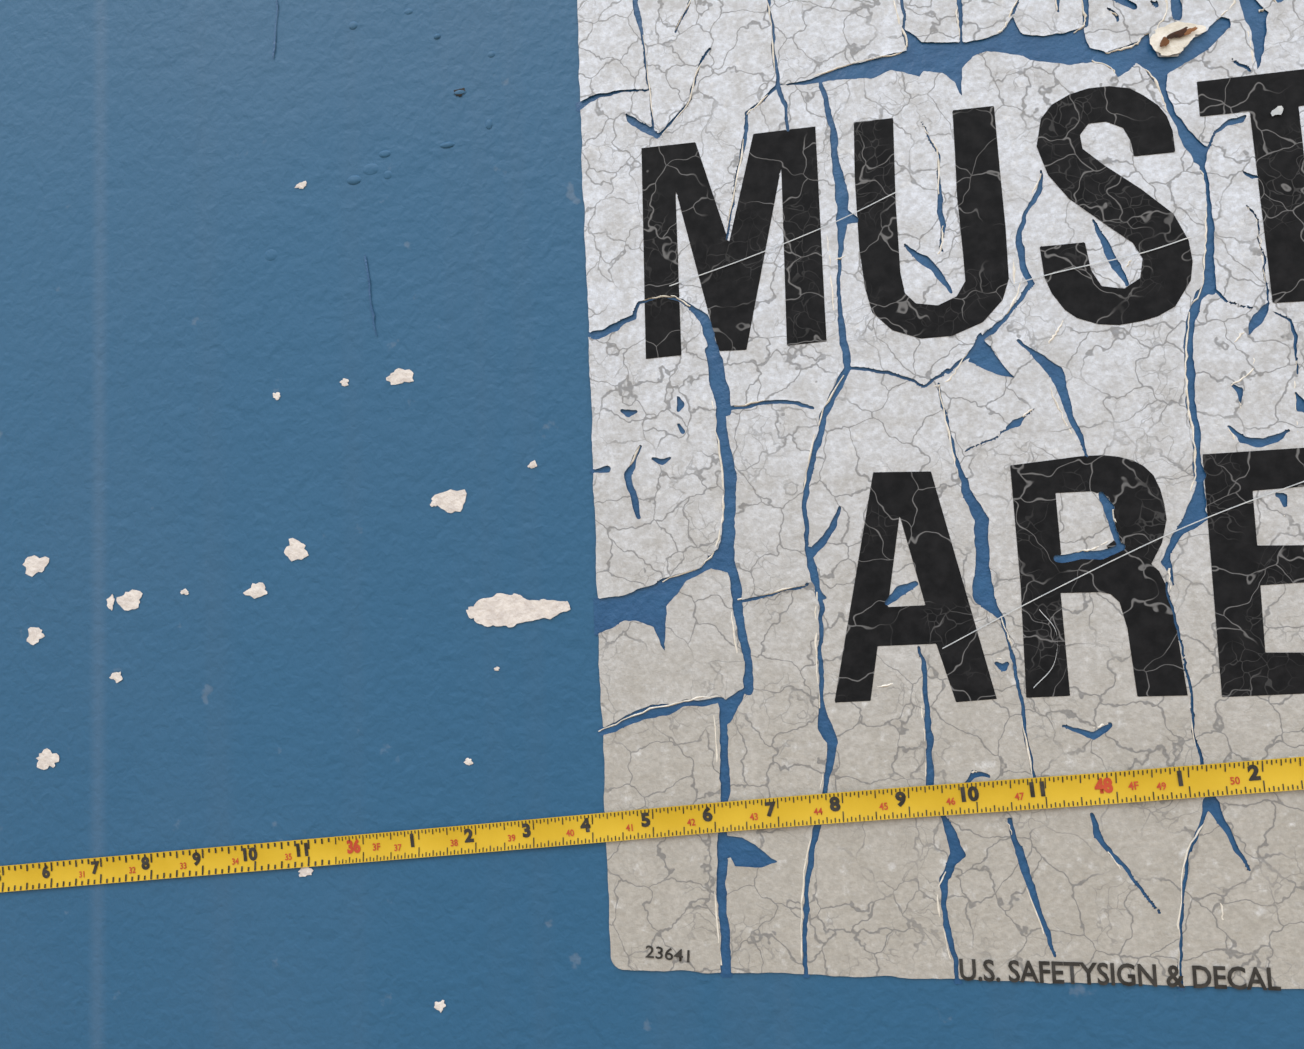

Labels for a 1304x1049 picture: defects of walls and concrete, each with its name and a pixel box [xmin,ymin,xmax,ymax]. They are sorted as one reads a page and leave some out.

rust [1150,21,1206,56]
peeling [386,368,414,385]
peeling [430,489,467,513]
crack [575,0,1304,991]
peeling [284,538,308,561]
peeling [22,555,49,577]
peeling [106,590,143,611]
peeling [243,582,267,599]
peeling [466,593,570,627]
peeling [27,627,44,645]
peeling [36,748,59,770]
peeling [298,867,313,877]